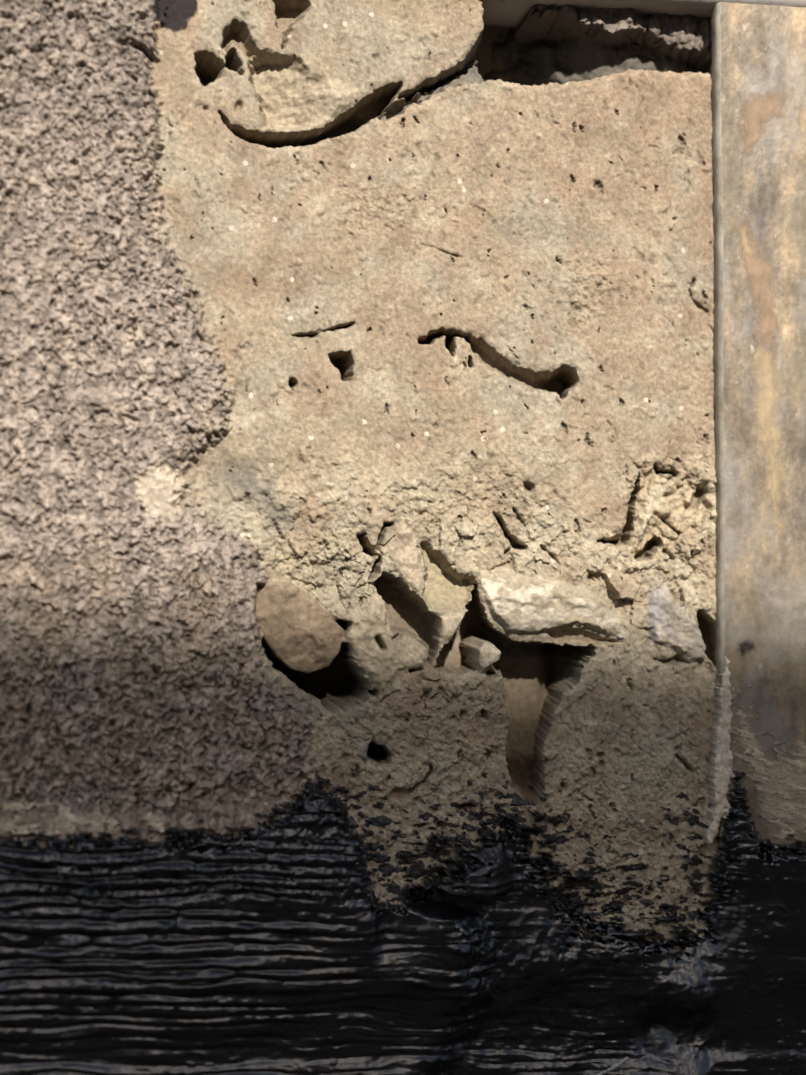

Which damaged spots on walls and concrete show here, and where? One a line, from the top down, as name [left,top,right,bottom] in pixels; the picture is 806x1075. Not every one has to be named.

spalling [247,48,362,136]
crack [219,83,403,148]
spalling [378,8,711,121]
crack [418,328,580,399]
rust [738,225,783,528]
spalling [597,464,713,564]
spalling [261,644,382,714]
spalling [336,619,353,630]
spalling [373,541,625,804]
spalling [697,610,726,667]
peeling [357,740,372,761]